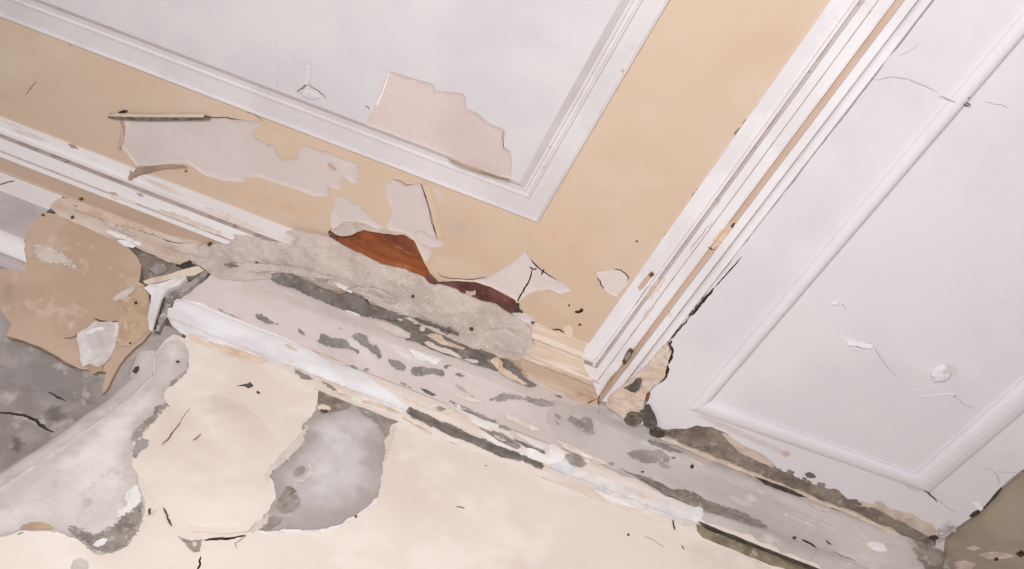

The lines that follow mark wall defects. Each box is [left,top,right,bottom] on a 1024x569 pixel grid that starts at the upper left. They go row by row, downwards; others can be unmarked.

crack [873,43,1008,108]
peeling [366,71,512,181]
spalling [0,110,976,569]
crack [0,412,54,432]
spalling [969,488,1002,518]
flaking render [966,546,1024,561]